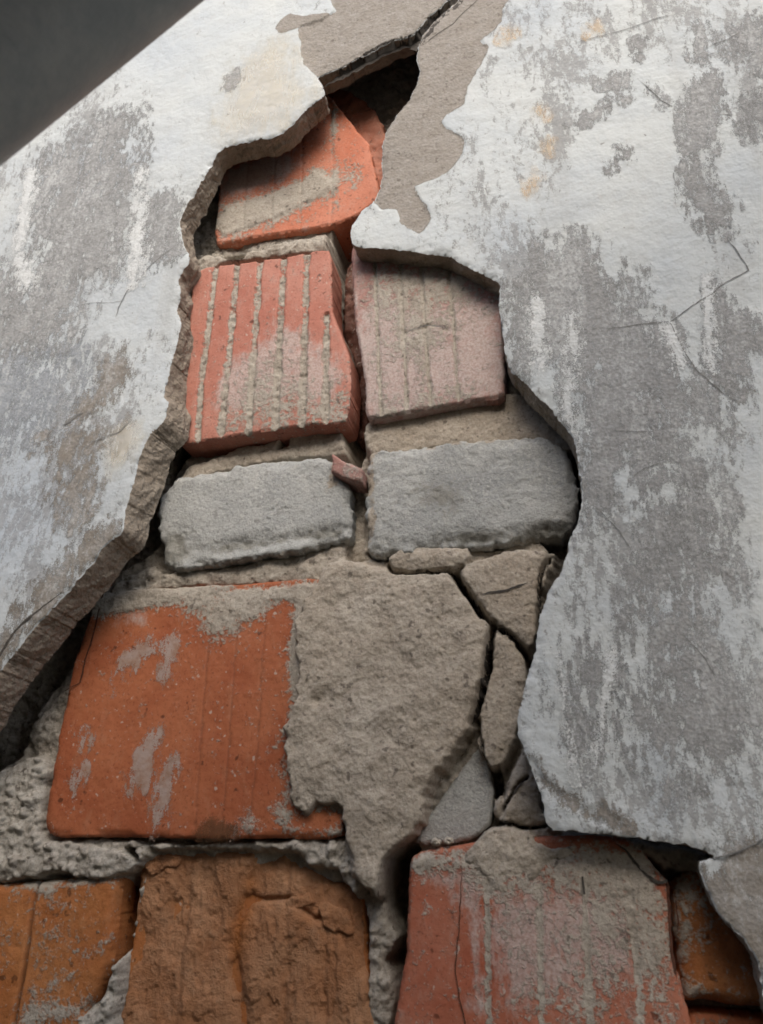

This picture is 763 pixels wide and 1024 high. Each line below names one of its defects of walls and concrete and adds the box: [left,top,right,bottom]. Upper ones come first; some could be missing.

peeling [562,6,763,243]
spalling [0,0,508,732]
crack [614,239,749,398]
peeling [352,222,763,809]
spalling [121,851,374,1024]
crack [455,870,466,1024]
peeling [520,740,763,1012]